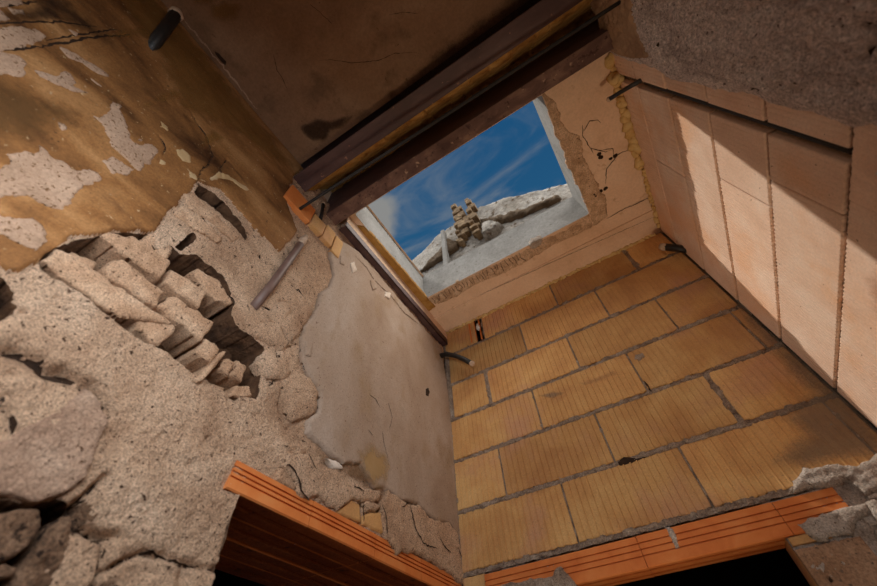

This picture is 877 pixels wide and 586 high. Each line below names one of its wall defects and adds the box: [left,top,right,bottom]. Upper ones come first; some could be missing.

peeling [0,0,88,93]
crack [0,1,130,51]
peeling [59,47,109,87]
peeling [0,102,166,210]
peeling [176,149,197,180]
spalling [171,192,239,244]
damp [303,119,346,139]
spalling [429,93,608,304]
crack [582,120,628,184]
spalling [0,216,252,400]
flaking render [299,242,459,537]
spalling [0,388,108,582]